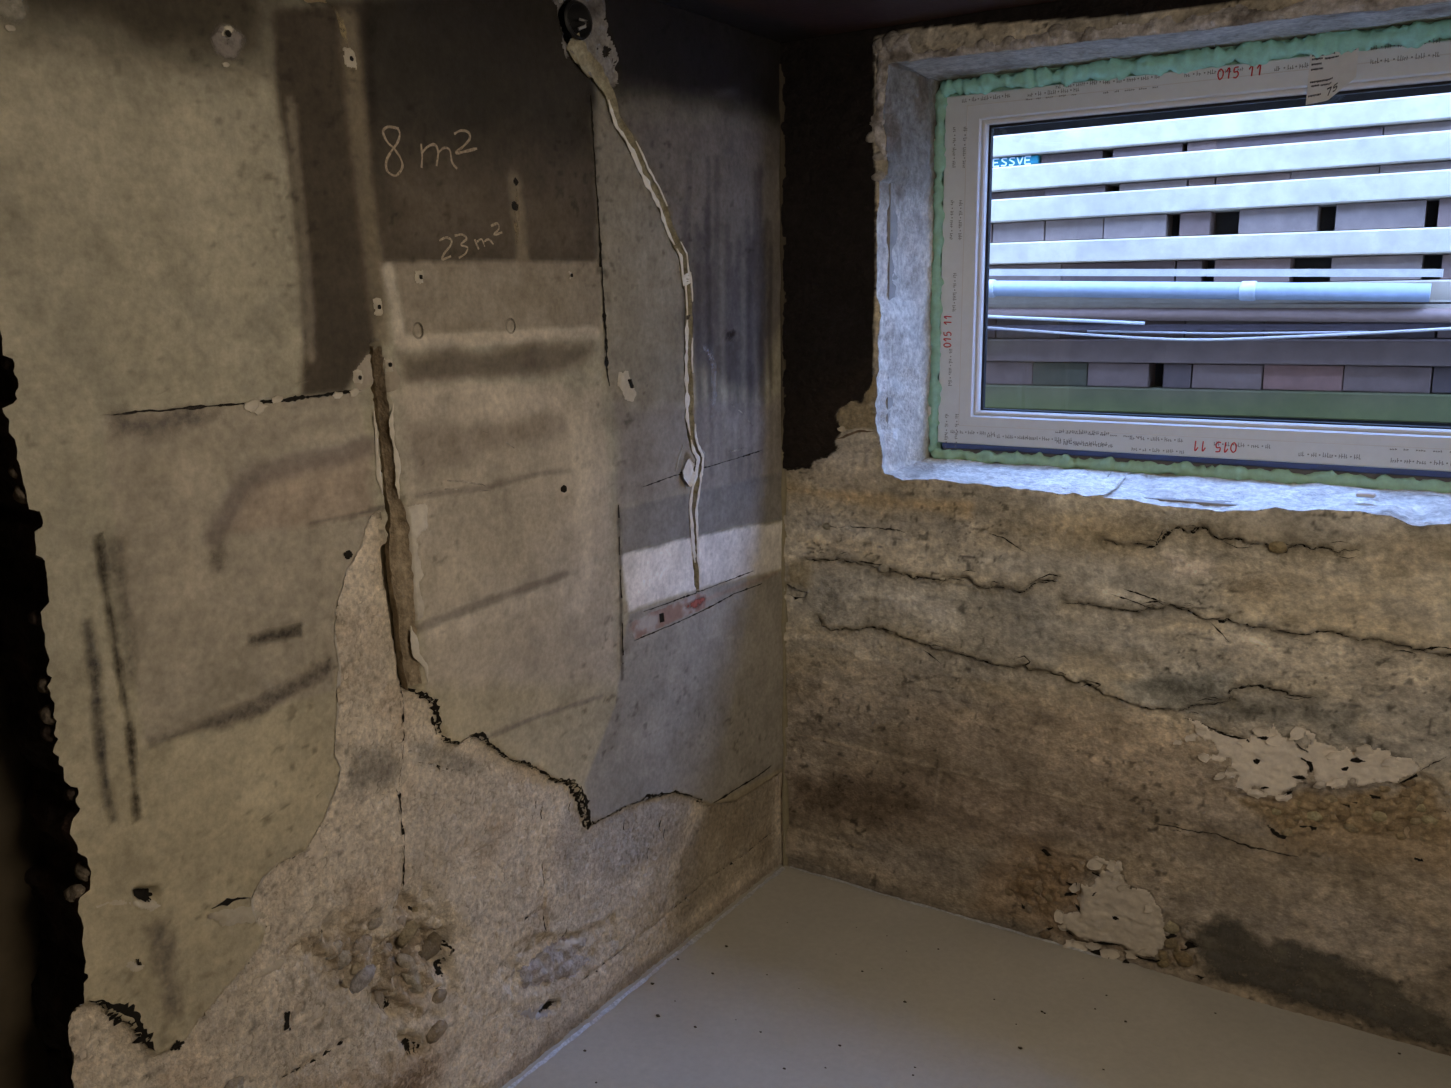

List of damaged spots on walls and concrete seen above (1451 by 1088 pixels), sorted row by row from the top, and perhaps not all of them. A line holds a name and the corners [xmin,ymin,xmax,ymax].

spalling [836,376,877,439]
crack [618,448,1451,735]
spalling [68,353,781,1088]
spalling [1173,718,1451,862]
peeling [999,847,1204,980]